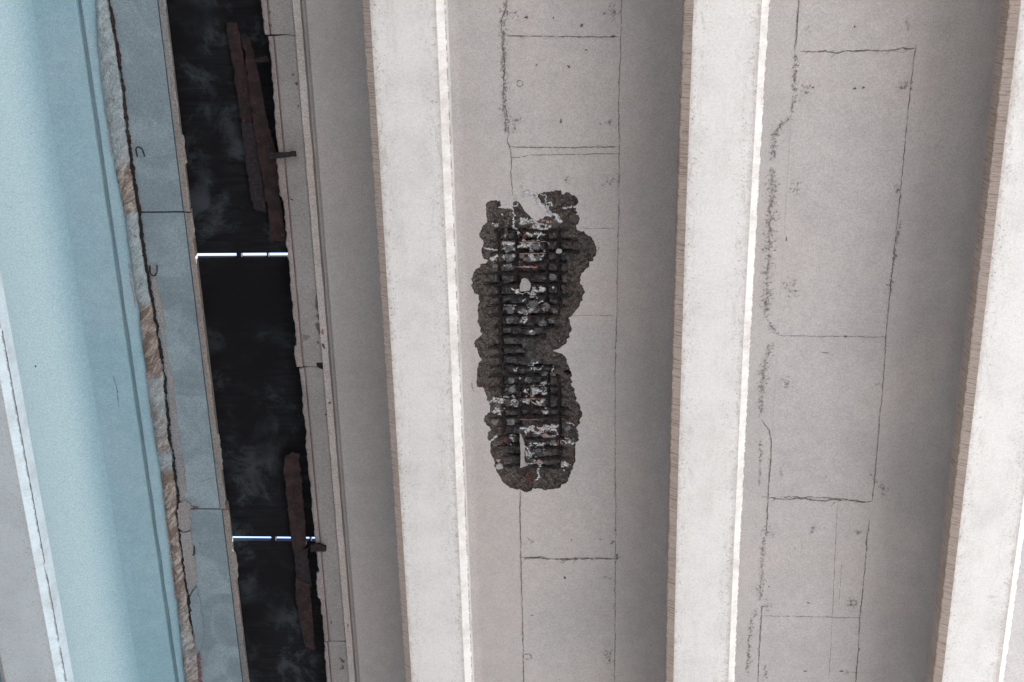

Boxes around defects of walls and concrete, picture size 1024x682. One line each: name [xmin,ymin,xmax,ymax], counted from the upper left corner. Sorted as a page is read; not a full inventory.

crack [108,0,211,636]
spalling [471,190,597,492]
crack [501,0,622,681]
crack [758,2,917,680]